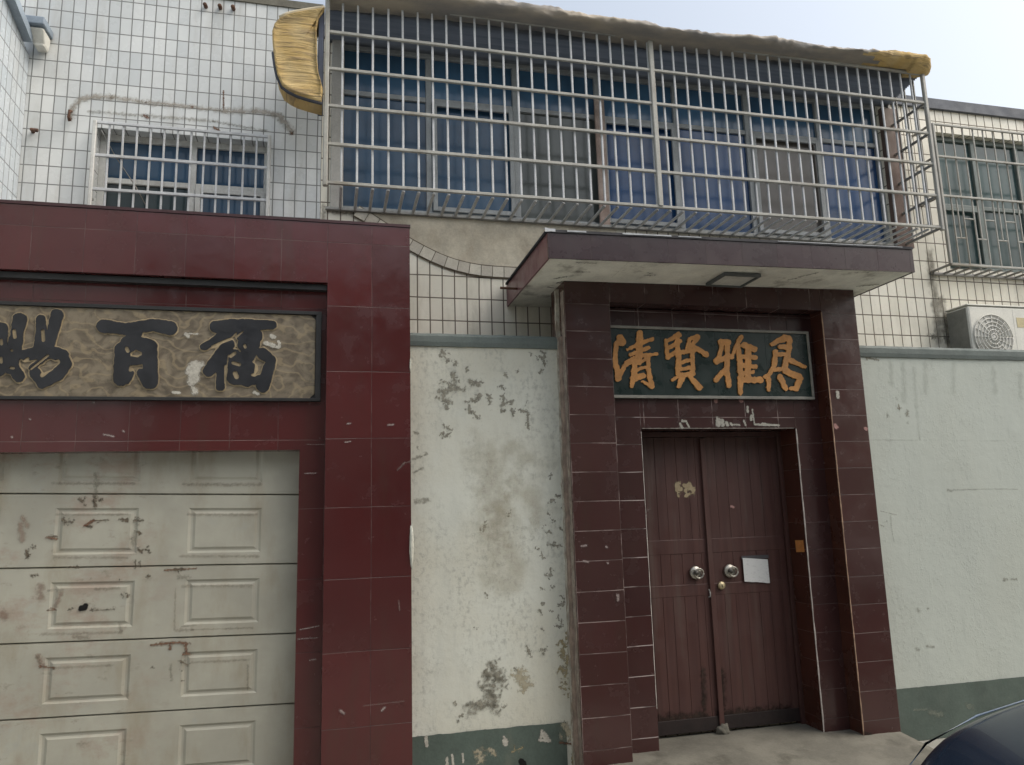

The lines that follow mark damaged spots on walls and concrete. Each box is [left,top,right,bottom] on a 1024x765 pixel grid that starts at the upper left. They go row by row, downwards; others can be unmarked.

peeling [263,334,281,349]
peeling [172,360,205,394]
peeling [436,349,530,430]
spalling [716,400,780,427]
rust [61,495,151,577]
peeling [526,494,570,698]
rust [150,641,191,681]
flaking render [453,661,534,723]